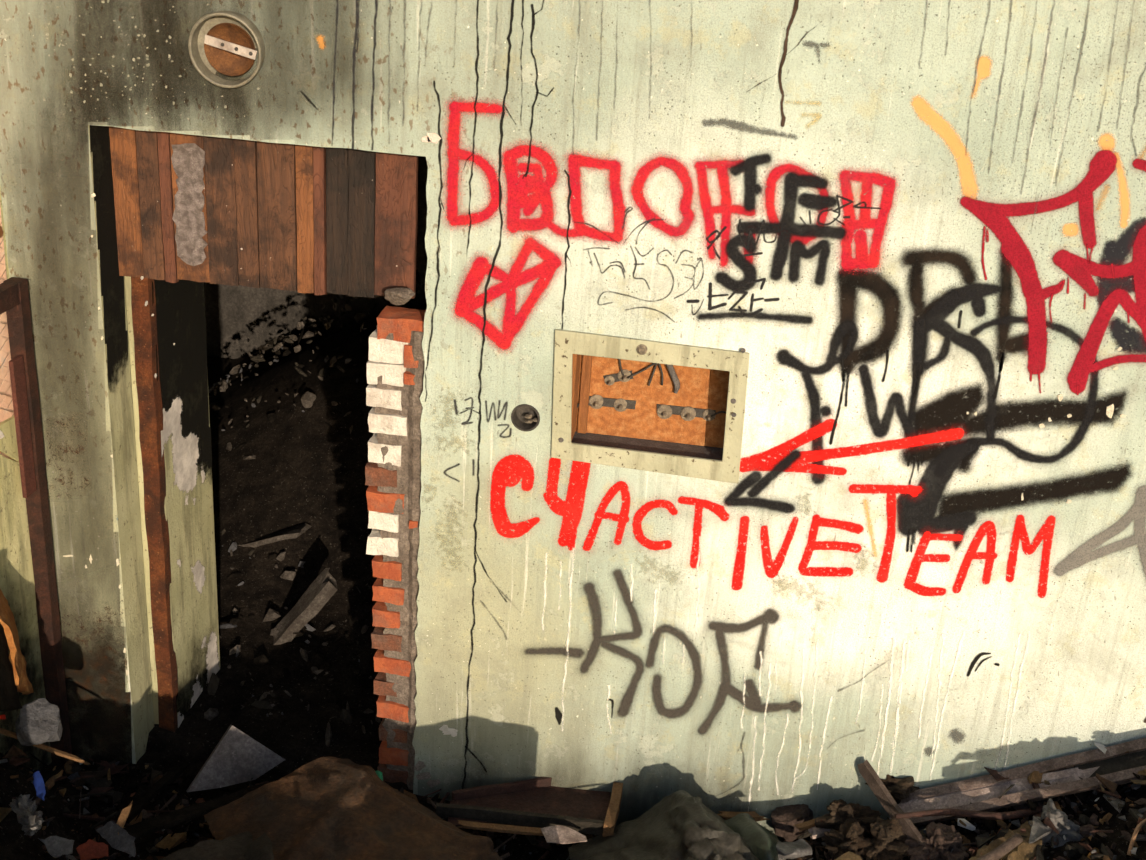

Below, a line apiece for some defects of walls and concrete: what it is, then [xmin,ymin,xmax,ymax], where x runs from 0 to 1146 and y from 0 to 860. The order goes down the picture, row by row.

crack [757,0,822,127]
peeling [161,395,205,505]
flaking render [365,288,426,790]
crack [425,0,554,789]